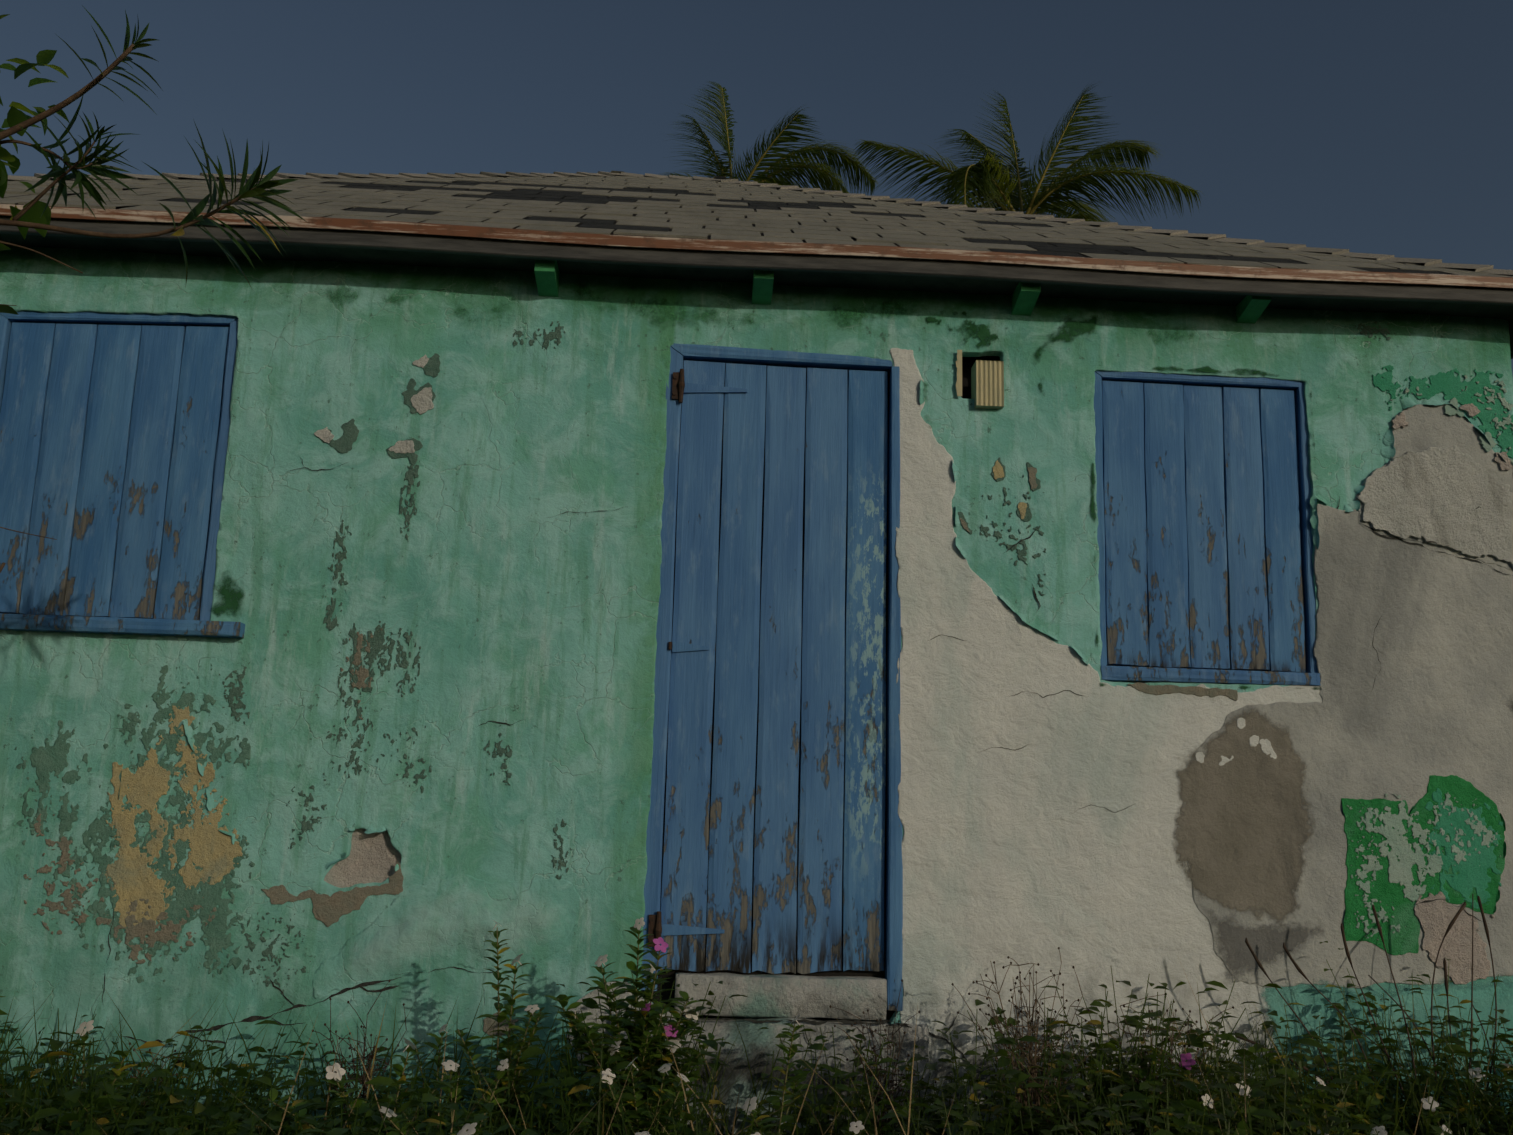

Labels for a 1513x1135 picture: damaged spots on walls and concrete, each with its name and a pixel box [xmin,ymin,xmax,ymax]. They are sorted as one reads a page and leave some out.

spalling [402,353,441,414]
spalling [314,419,359,453]
spalling [386,438,423,540]
peeling [286,517,432,849]
peeling [890,348,1513,1135]
peeling [14,658,404,995]
damp [1175,710,1320,978]
crack [102,912,114,1002]
crack [116,967,501,1043]